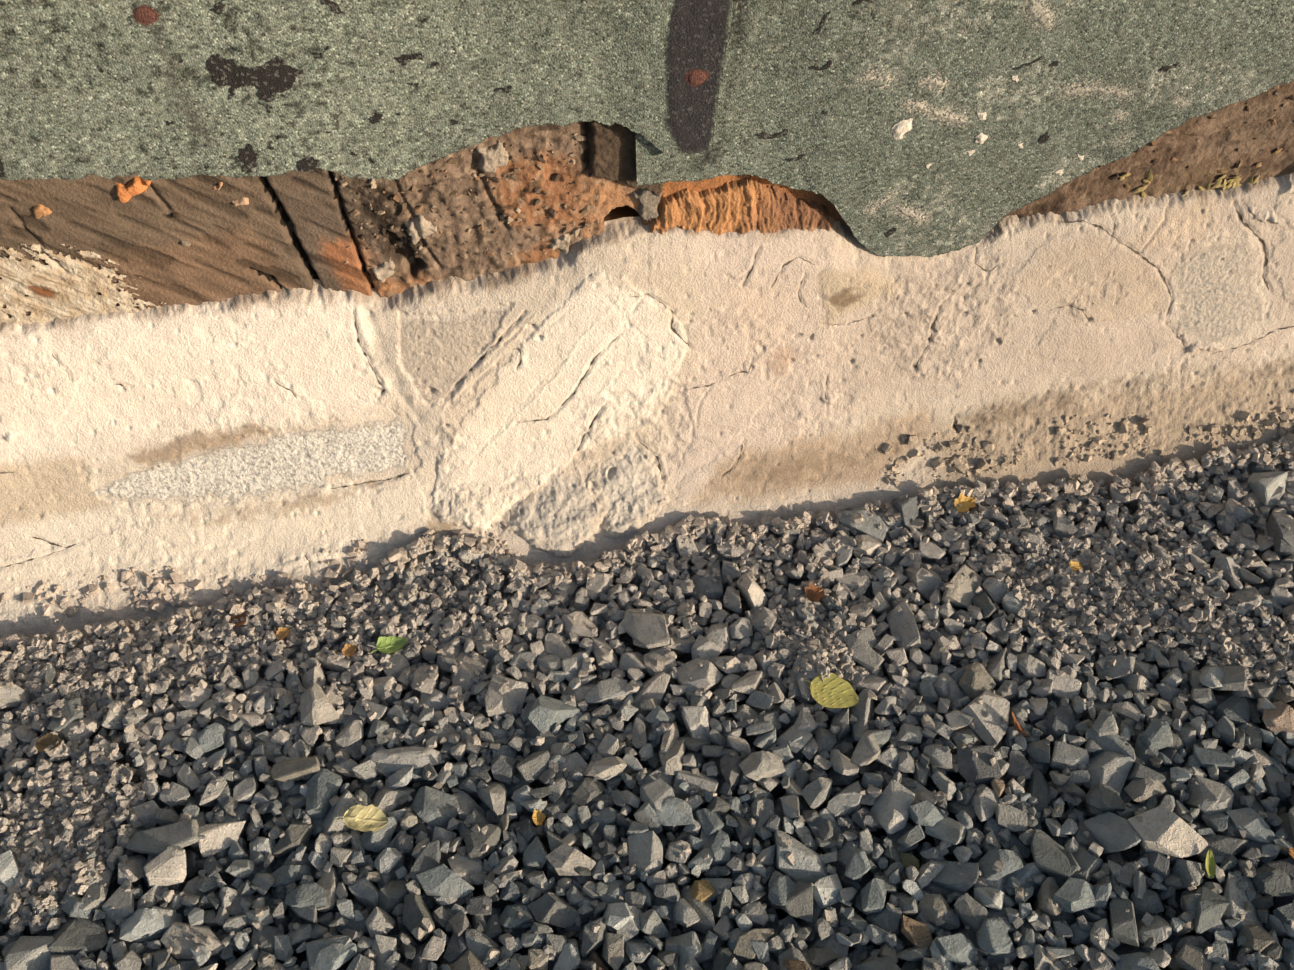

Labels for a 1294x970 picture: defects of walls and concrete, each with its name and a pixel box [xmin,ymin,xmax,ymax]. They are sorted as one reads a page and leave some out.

crack [1233,202,1269,290]
peeling [0,243,169,326]
crack [456,312,525,385]
crack [519,338,617,451]
crack [641,294,690,347]
crack [685,358,754,390]
crack [744,253,874,325]
crack [914,312,938,371]
crack [1066,218,1294,355]
crack [331,471,413,489]